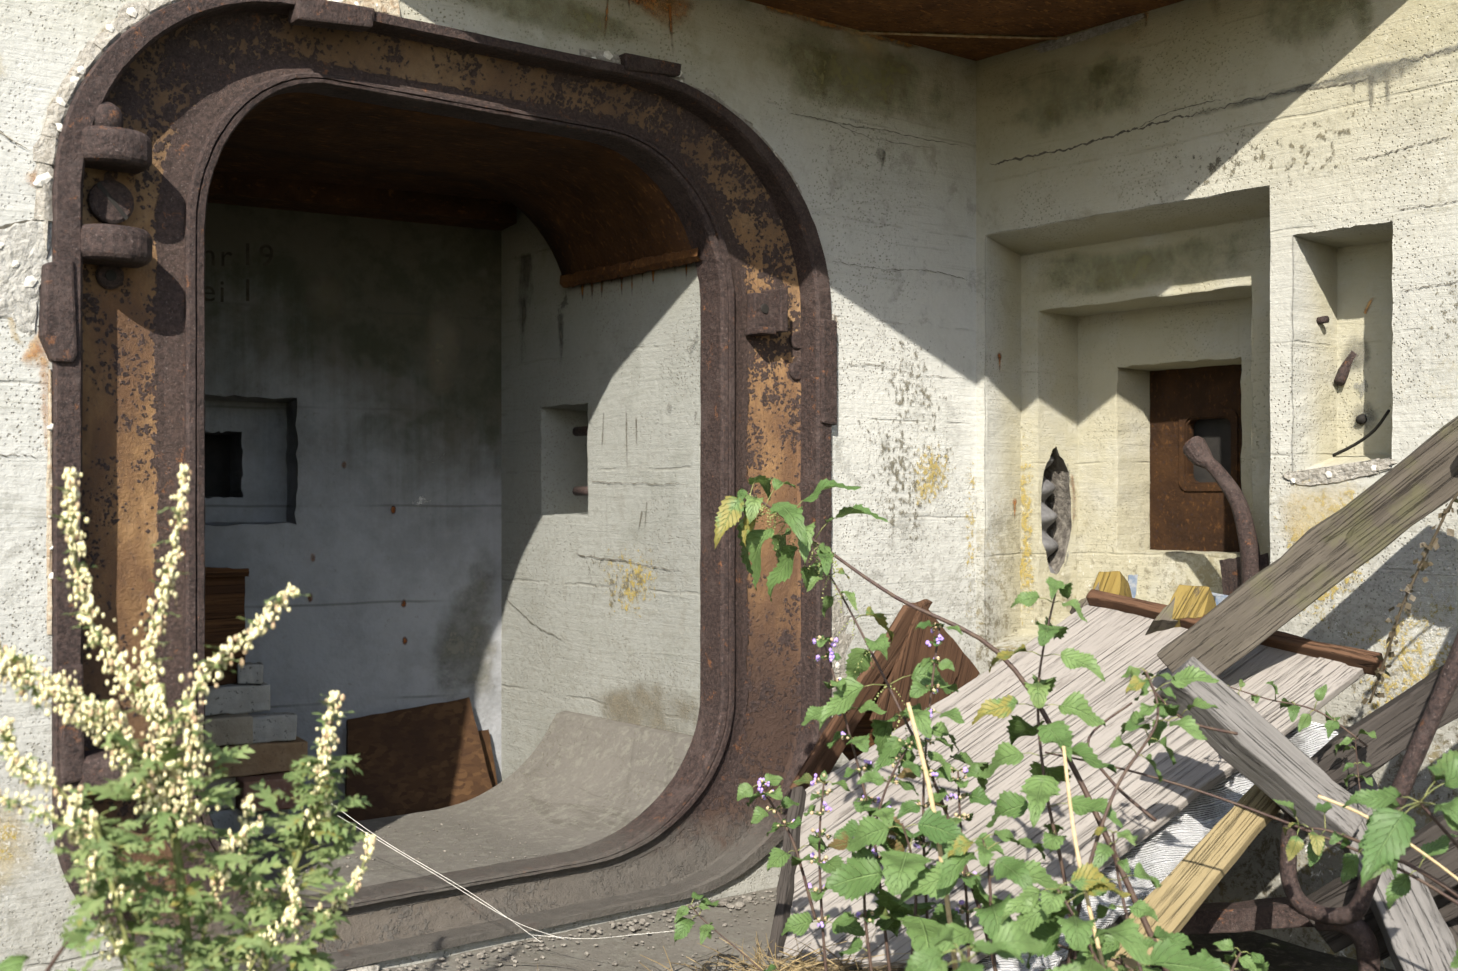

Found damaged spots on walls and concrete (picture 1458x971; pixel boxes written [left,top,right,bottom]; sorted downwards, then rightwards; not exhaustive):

spalling [0,0,182,336]
crack [789,45,1458,165]
spalling [1043,447,1072,575]